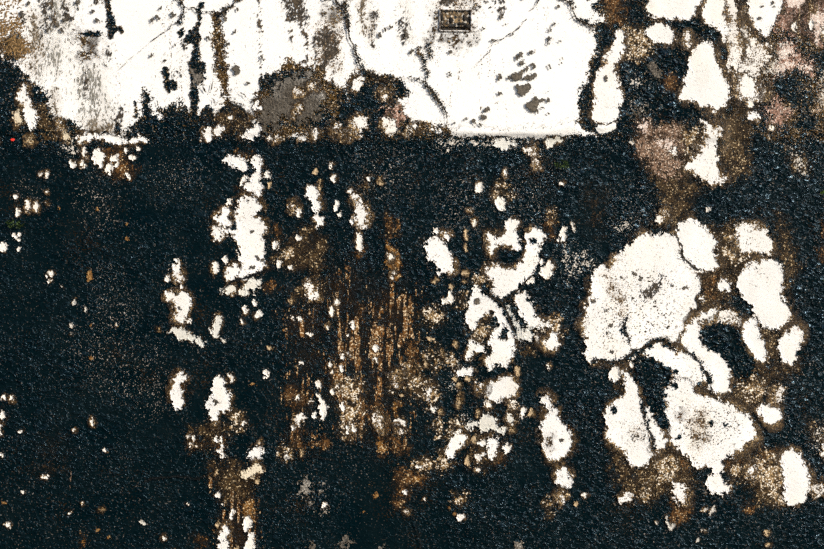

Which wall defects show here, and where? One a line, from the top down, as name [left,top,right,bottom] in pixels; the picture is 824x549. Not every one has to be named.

peeling [52,116,150,182]
damp [0,0,263,158]
crack [121,0,243,68]
damp [254,0,267,92]
spalling [199,55,424,325]
crack [324,0,451,137]
crack [478,0,597,63]
damp [279,0,824,165]
peeling [156,258,226,348]
peeling [385,166,824,522]
crack [590,313,713,390]
peeling [186,371,266,549]